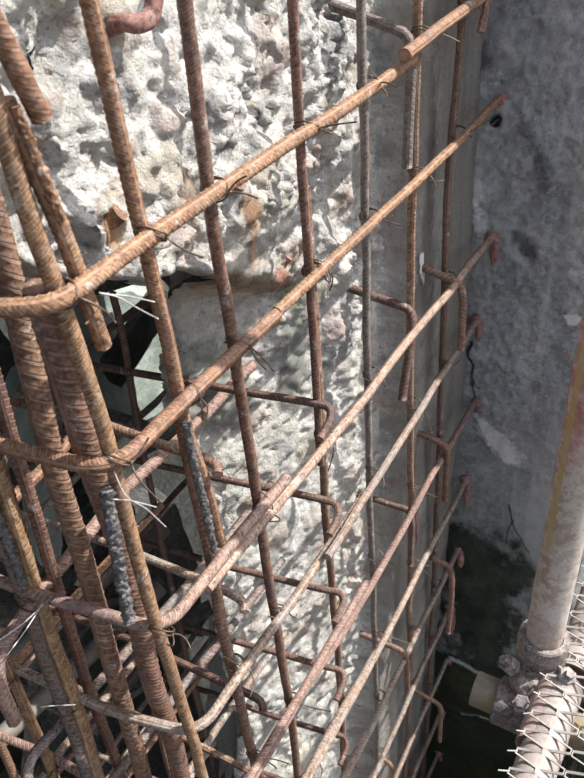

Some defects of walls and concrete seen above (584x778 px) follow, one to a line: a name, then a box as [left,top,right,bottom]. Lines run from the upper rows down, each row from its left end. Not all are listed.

rust [105,218,123,248]
spalling [229,273,295,296]
crack [466,341,484,413]